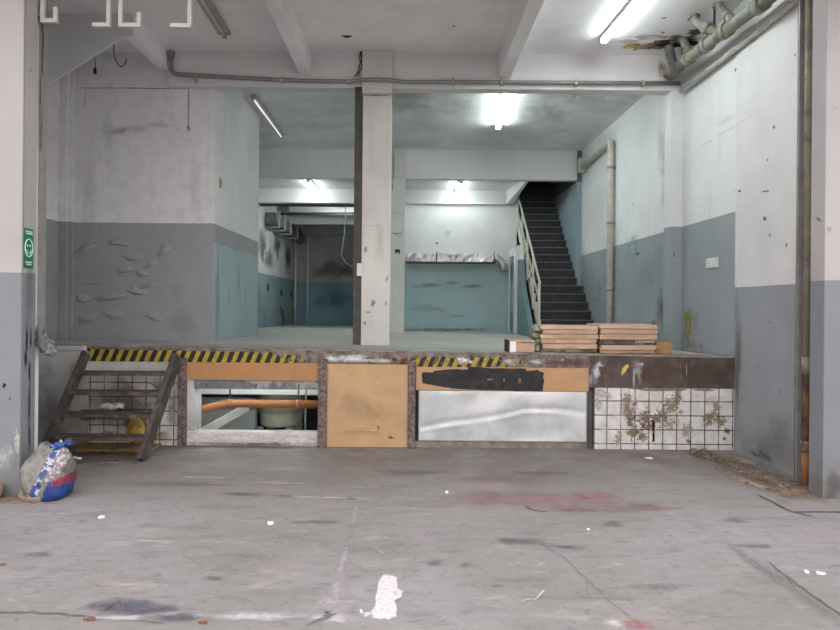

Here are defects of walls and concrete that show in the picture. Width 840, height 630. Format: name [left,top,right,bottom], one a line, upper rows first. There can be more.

spalling [623,32,699,49]
crack [759,495,840,517]
crack [769,562,840,614]